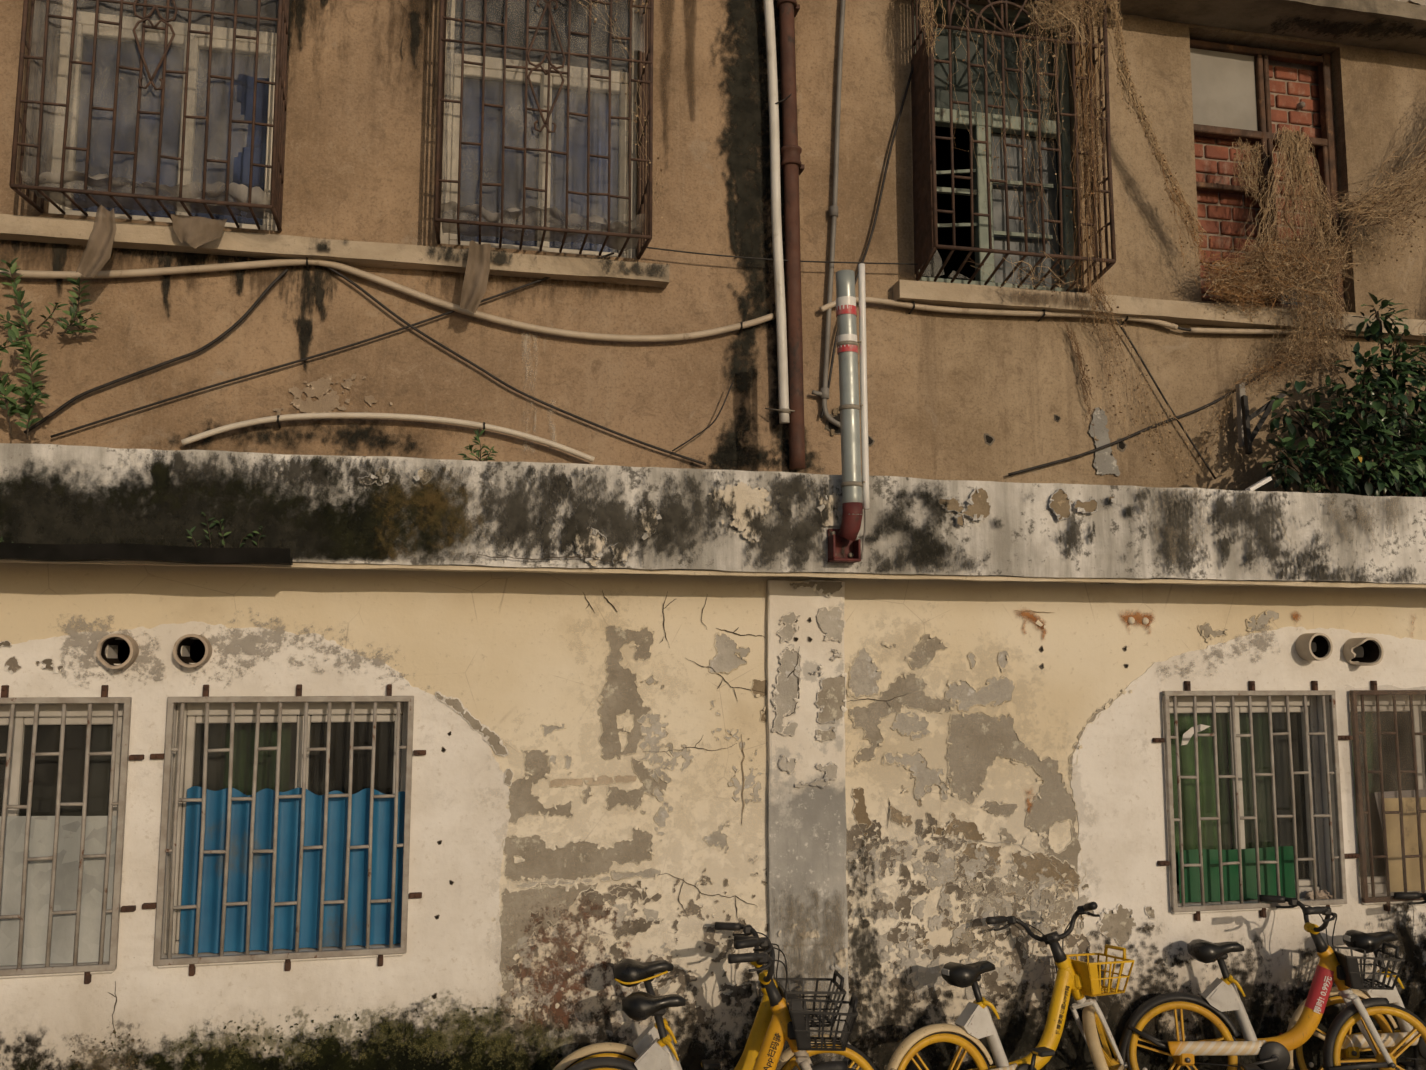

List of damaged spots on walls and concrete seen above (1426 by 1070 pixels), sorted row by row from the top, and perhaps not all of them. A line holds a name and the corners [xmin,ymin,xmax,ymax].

water stain [0,0,845,570]
peeling [709,480,772,543]
peeling [817,493,843,526]
peeling [938,486,992,527]
water stain [1106,488,1418,582]
rust [1021,611,1046,639]
rust [1121,612,1153,633]
peeling [435,625,820,1059]
peeling [707,579,1156,1053]
water stain [775,837,1054,1070]
water stain [1040,923,1318,1070]
water stain [1341,903,1426,1070]